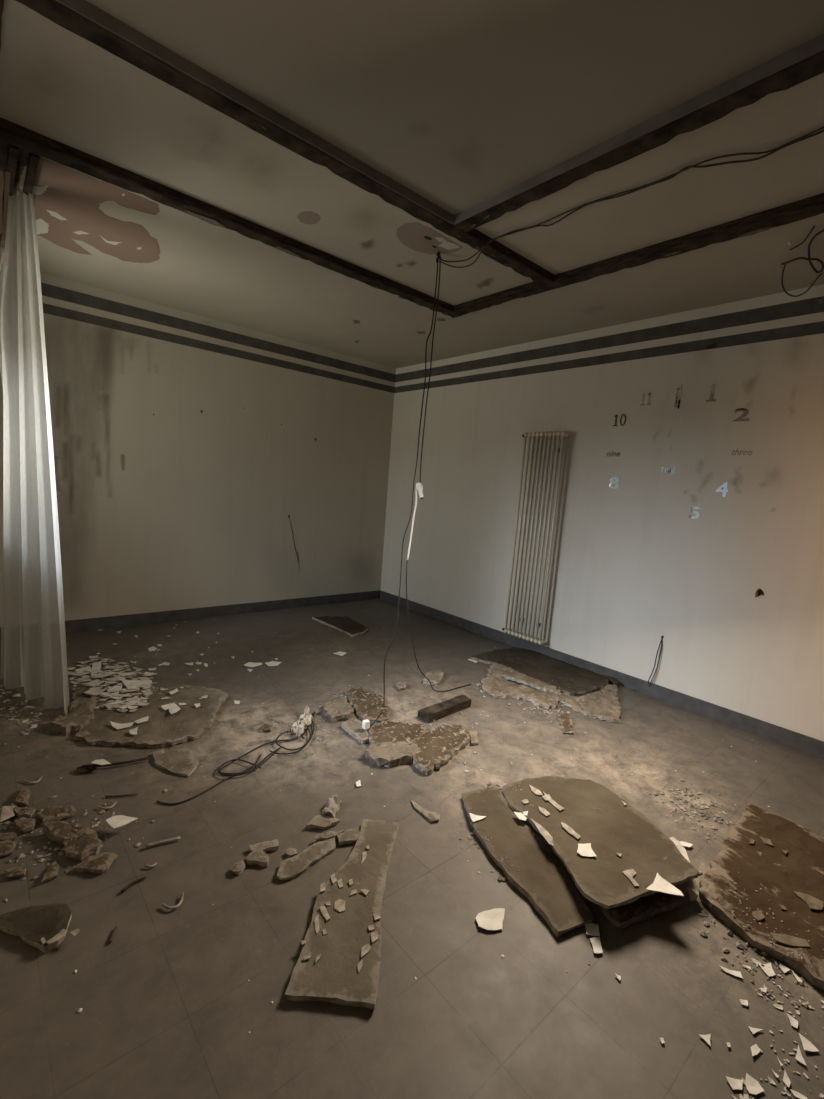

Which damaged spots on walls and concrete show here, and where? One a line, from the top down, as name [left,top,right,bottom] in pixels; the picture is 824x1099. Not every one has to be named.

peeling [17,159,160,263]